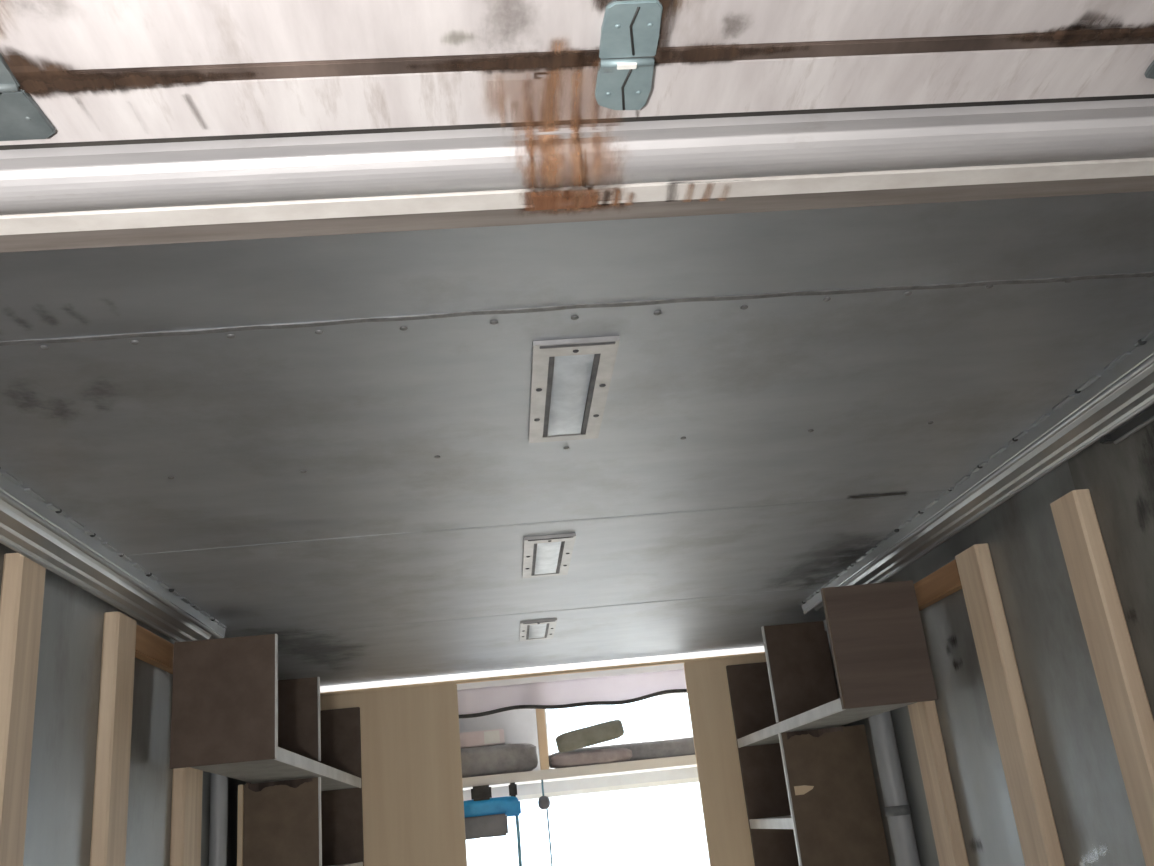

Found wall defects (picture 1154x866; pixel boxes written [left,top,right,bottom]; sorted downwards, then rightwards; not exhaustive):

corrosion [657,0,682,47]
corrosion [525,68,632,214]